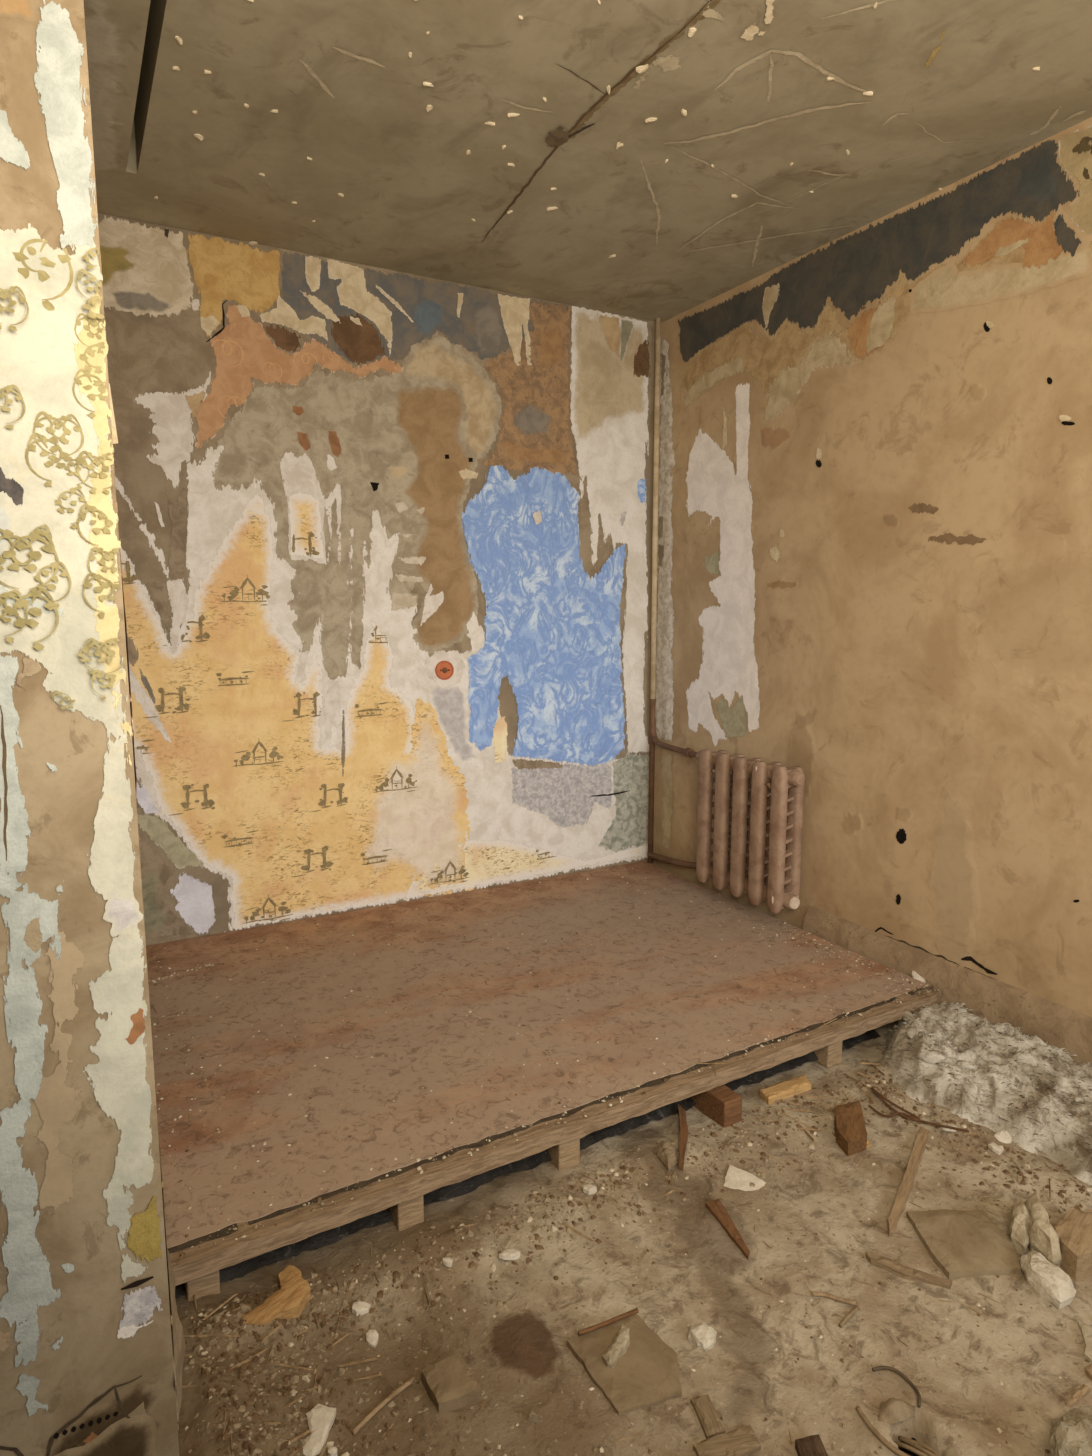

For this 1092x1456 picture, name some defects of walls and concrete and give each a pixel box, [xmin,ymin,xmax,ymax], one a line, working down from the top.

crack [481,0,721,243]
peeling [262,252,571,365]
peeling [655,105,1081,851]
flaking render [138,833,199,939]